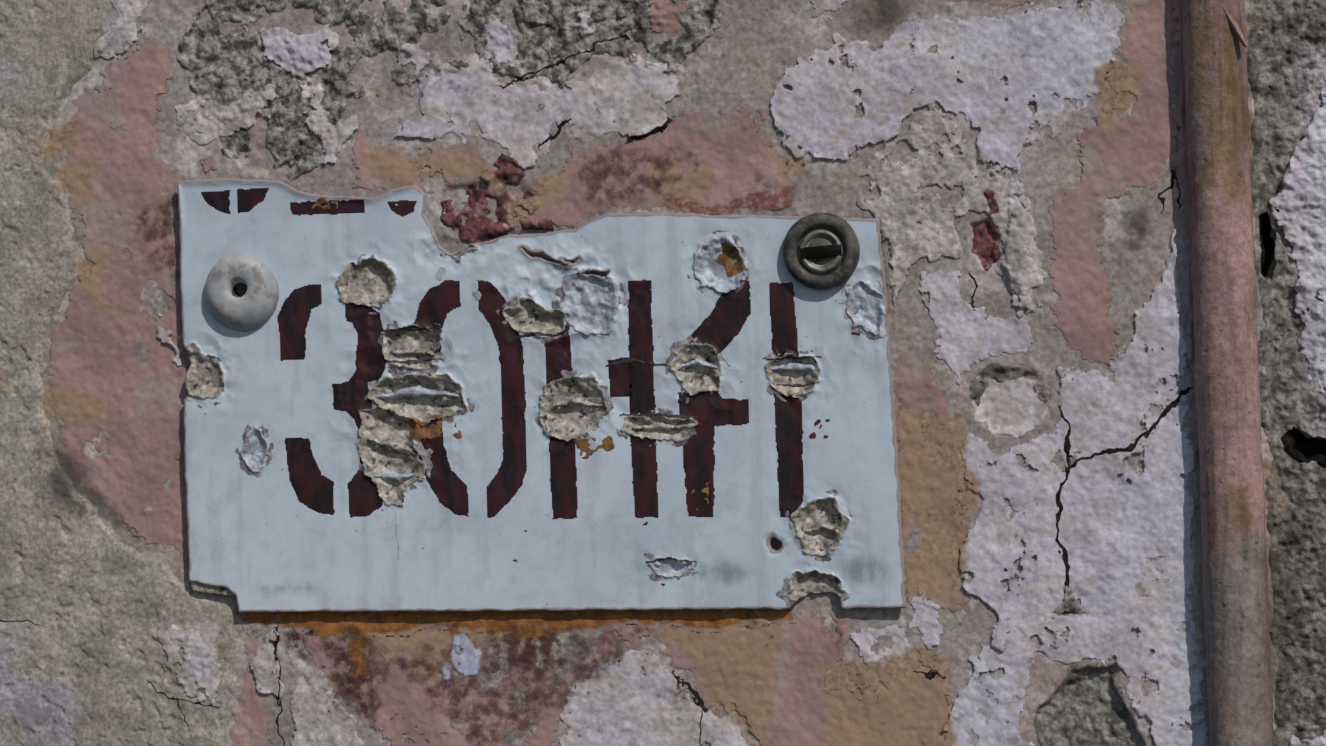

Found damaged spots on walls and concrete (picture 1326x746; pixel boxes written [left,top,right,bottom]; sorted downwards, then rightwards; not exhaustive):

peeling [40,0,792,561]
peeling [1258,75,1326,394]
peeling [290,0,1208,746]
crack [1055,387,1194,613]
spalling [1280,426,1326,468]
peeling [151,620,223,707]
peeling [229,614,285,746]
crack [273,625,285,746]
corrosion [237,607,792,745]
crack [672,670,708,746]